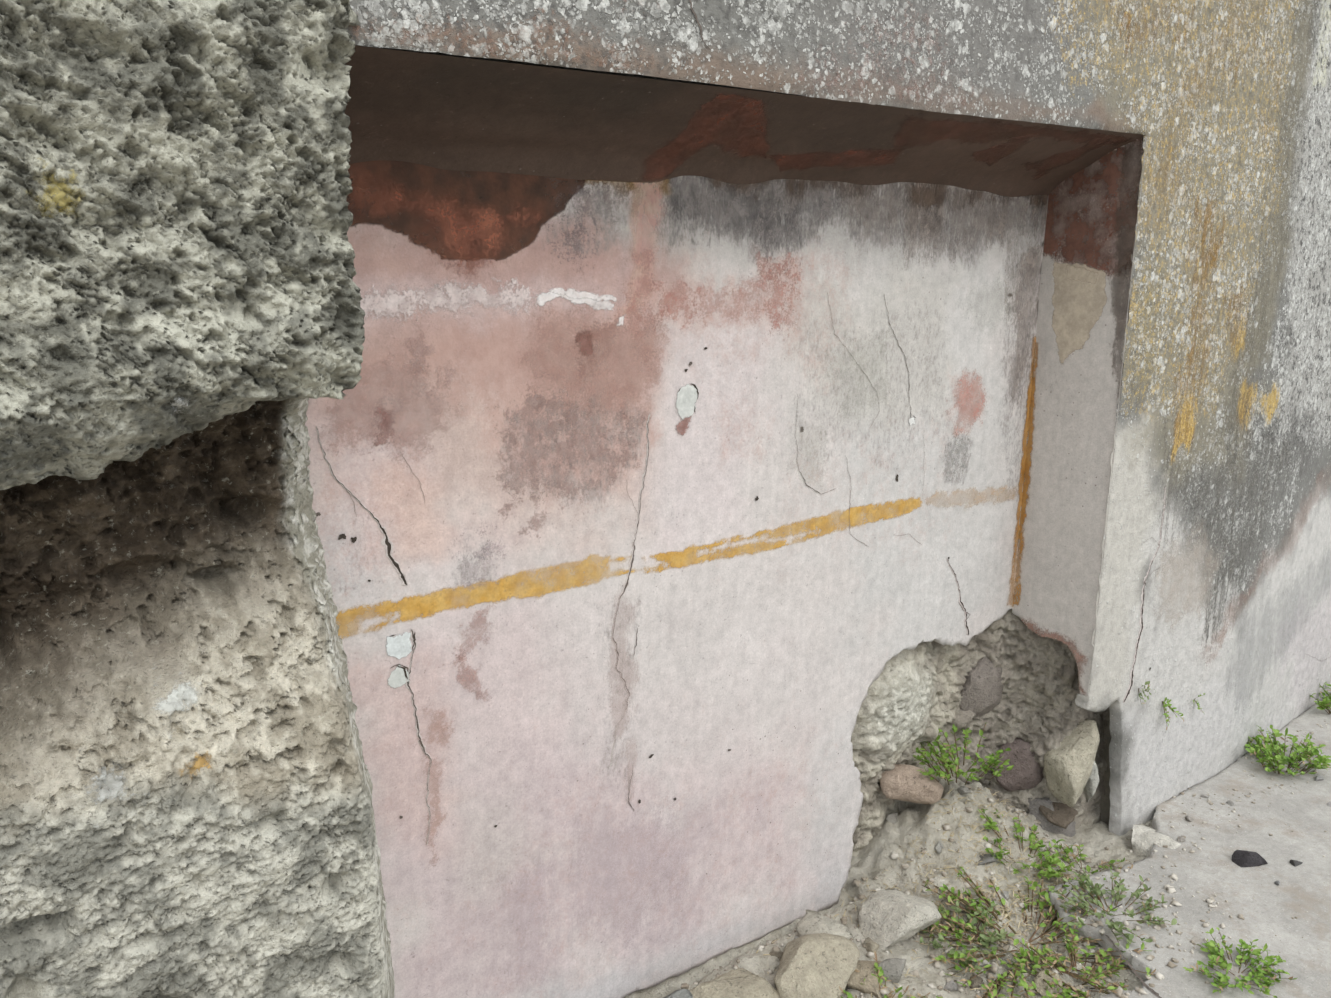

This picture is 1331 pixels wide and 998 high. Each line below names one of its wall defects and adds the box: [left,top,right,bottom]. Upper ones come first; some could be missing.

spalling [676,362,699,420]
crack [316,426,408,586]
spalling [386,632,416,688]
crack [391,629,432,845]
crack [609,414,650,810]
spalling [851,594,1110,856]
crack [1123,486,1166,703]